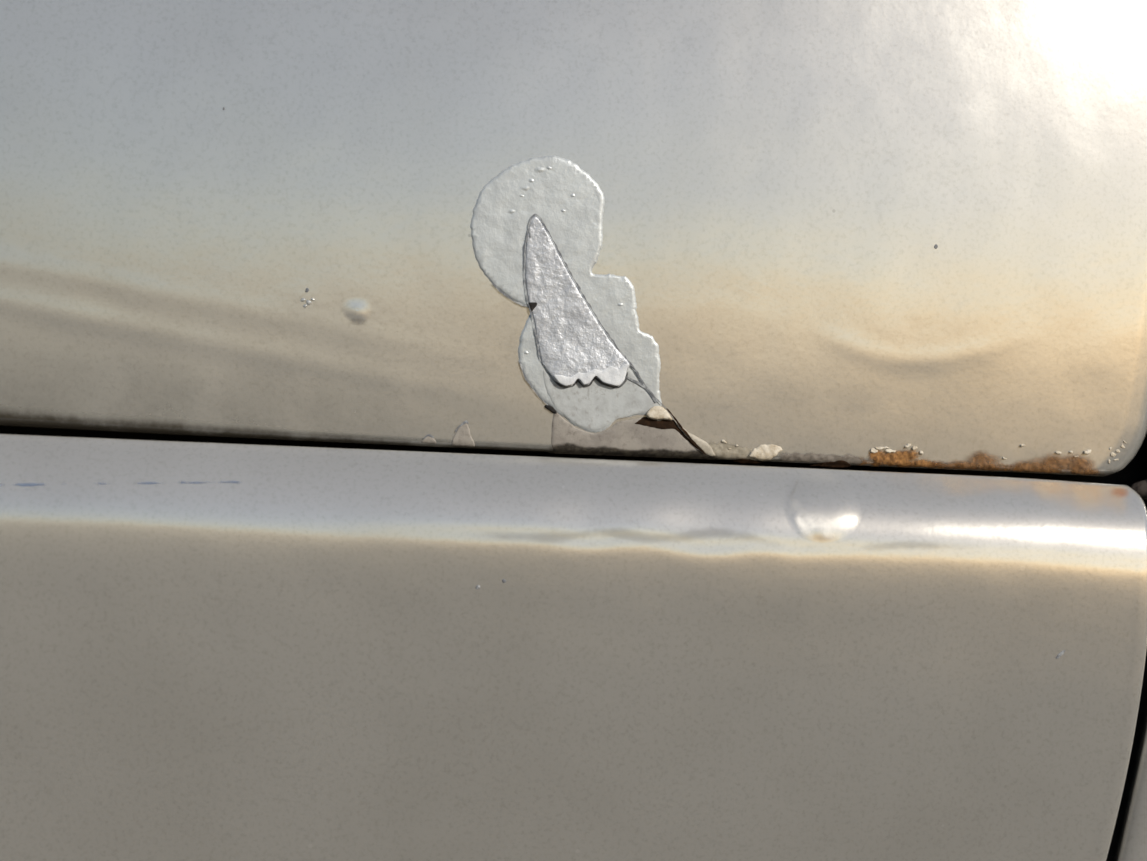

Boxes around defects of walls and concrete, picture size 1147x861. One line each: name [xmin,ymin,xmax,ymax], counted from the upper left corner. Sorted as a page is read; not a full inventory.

peeling [470,155,862,468]
peeling [451,420,475,447]
corrosion [858,444,1097,475]